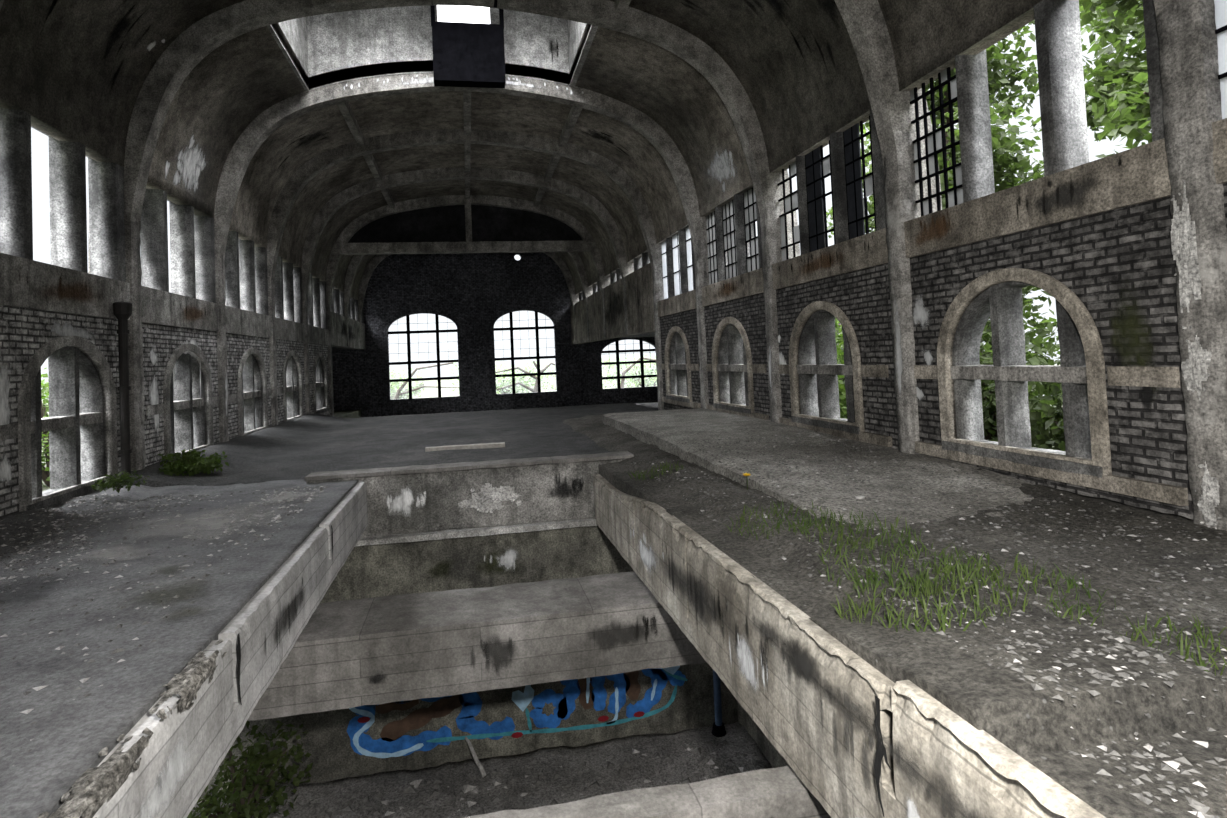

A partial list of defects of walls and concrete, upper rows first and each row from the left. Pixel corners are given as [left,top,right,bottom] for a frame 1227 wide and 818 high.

spalling [1171,180,1212,400]
spalling [37,639,227,818]
water stain [471,639,513,673]
water stain [592,616,657,649]
water stain [630,528,982,818]